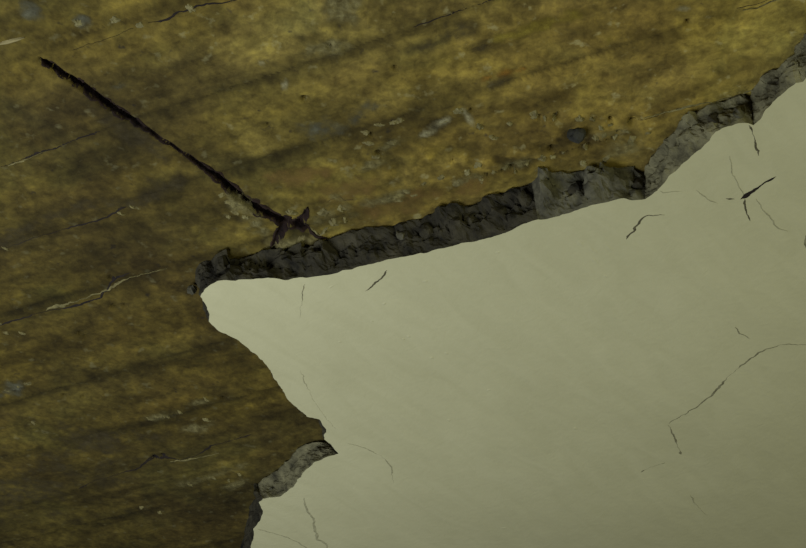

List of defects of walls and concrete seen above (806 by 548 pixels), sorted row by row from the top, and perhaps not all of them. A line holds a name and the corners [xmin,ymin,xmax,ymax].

crack [72,0,236,50]
crack [1,131,100,167]
crack [41,57,327,249]
flaking render [187,33,806,321]
crack [626,214,661,239]
crack [661,158,787,231]
crack [749,125,760,156]
crack [641,327,805,472]
flaking render [225,420,338,548]